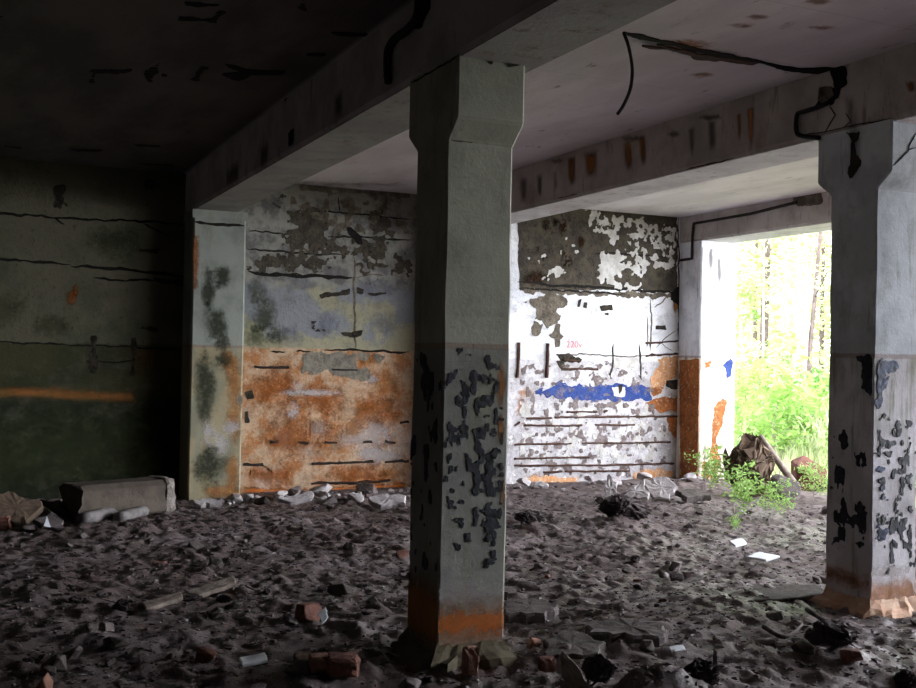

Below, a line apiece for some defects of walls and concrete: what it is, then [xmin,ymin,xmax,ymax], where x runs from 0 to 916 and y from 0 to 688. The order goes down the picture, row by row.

crack [623,31,836,74]
crack [807,106,893,135]
crack [893,134,916,166]
peeling [247,184,416,299]
leakage [194,268,238,487]
rust [258,369,397,458]
peeling [176,209,727,640]
peeling [723,359,733,378]
rust [208,459,289,497]
peeling [759,354,916,583]
rust [407,574,504,646]
rust [825,566,915,601]